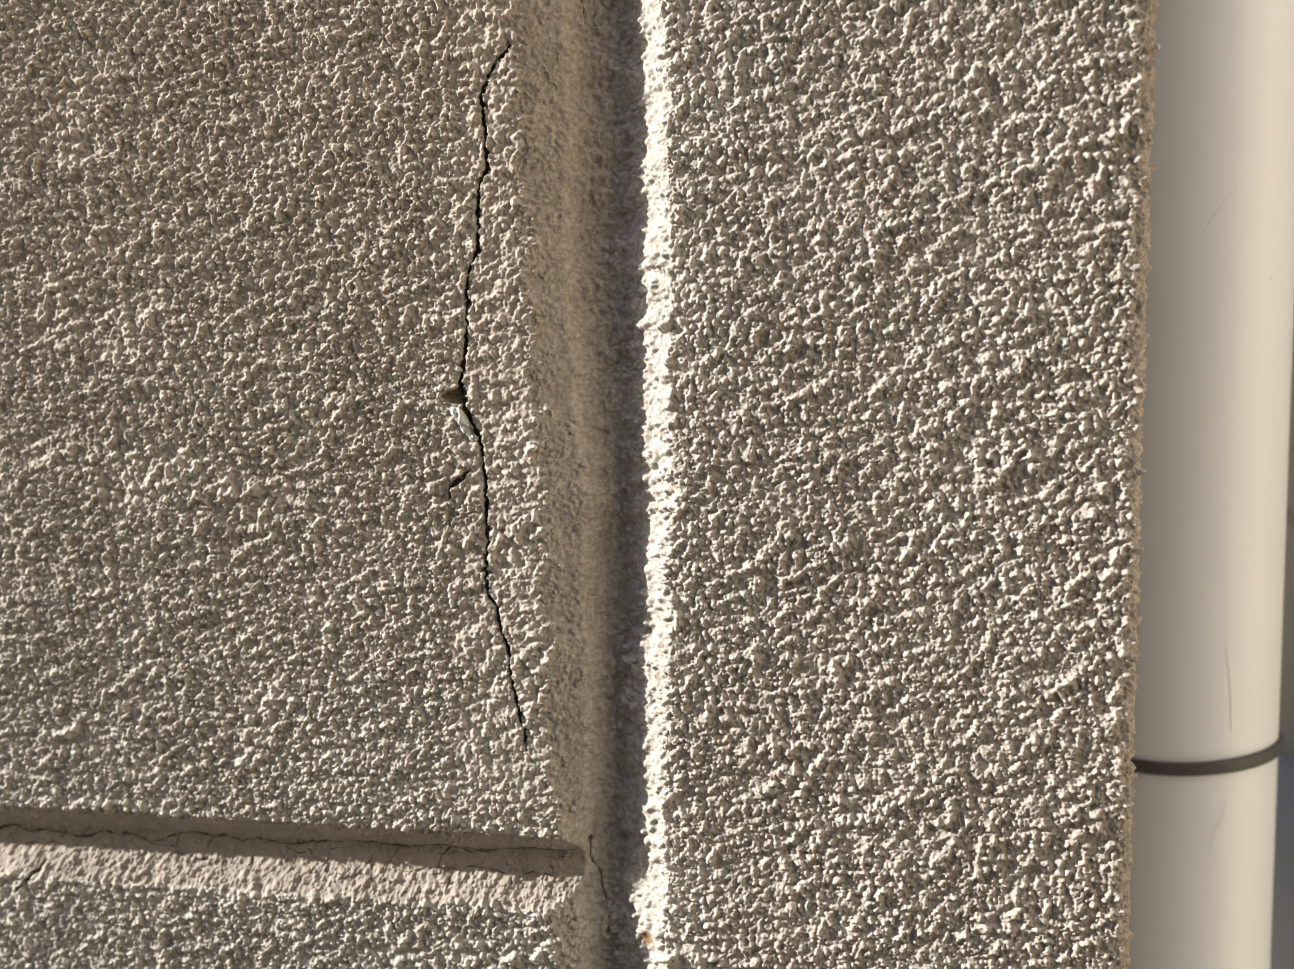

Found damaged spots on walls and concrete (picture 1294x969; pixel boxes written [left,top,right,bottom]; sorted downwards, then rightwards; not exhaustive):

crack [458,45,527,745]